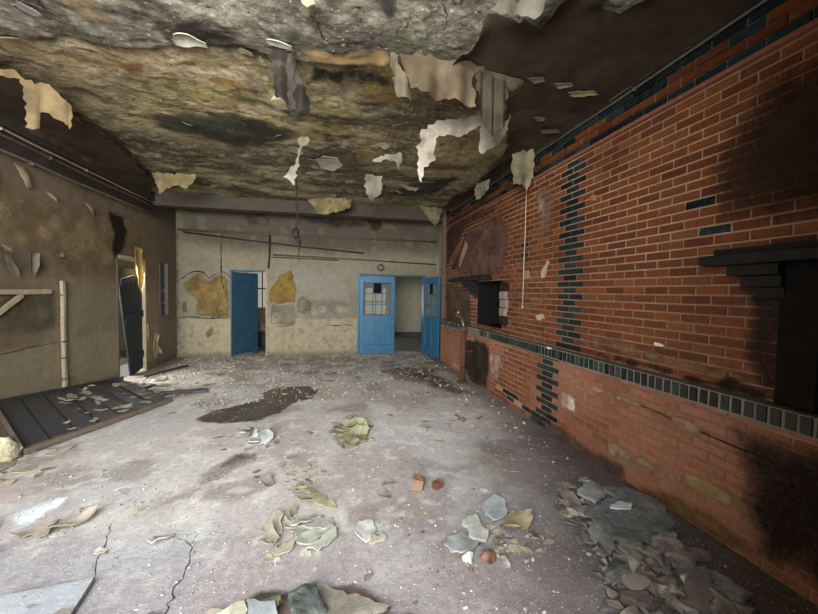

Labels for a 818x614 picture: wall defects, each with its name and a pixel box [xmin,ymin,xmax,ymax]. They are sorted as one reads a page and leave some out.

peeling [14,1,43,17]
flaking render [173,21,228,48]
peeling [266,29,310,119]
peeling [0,69,73,130]
leakage [150,112,291,146]
peeling [284,0,762,226]
peeling [14,163,32,188]
peeling [152,162,212,194]
crack [177,230,230,319]
leakage [198,386,318,423]
crack [148,535,197,614]